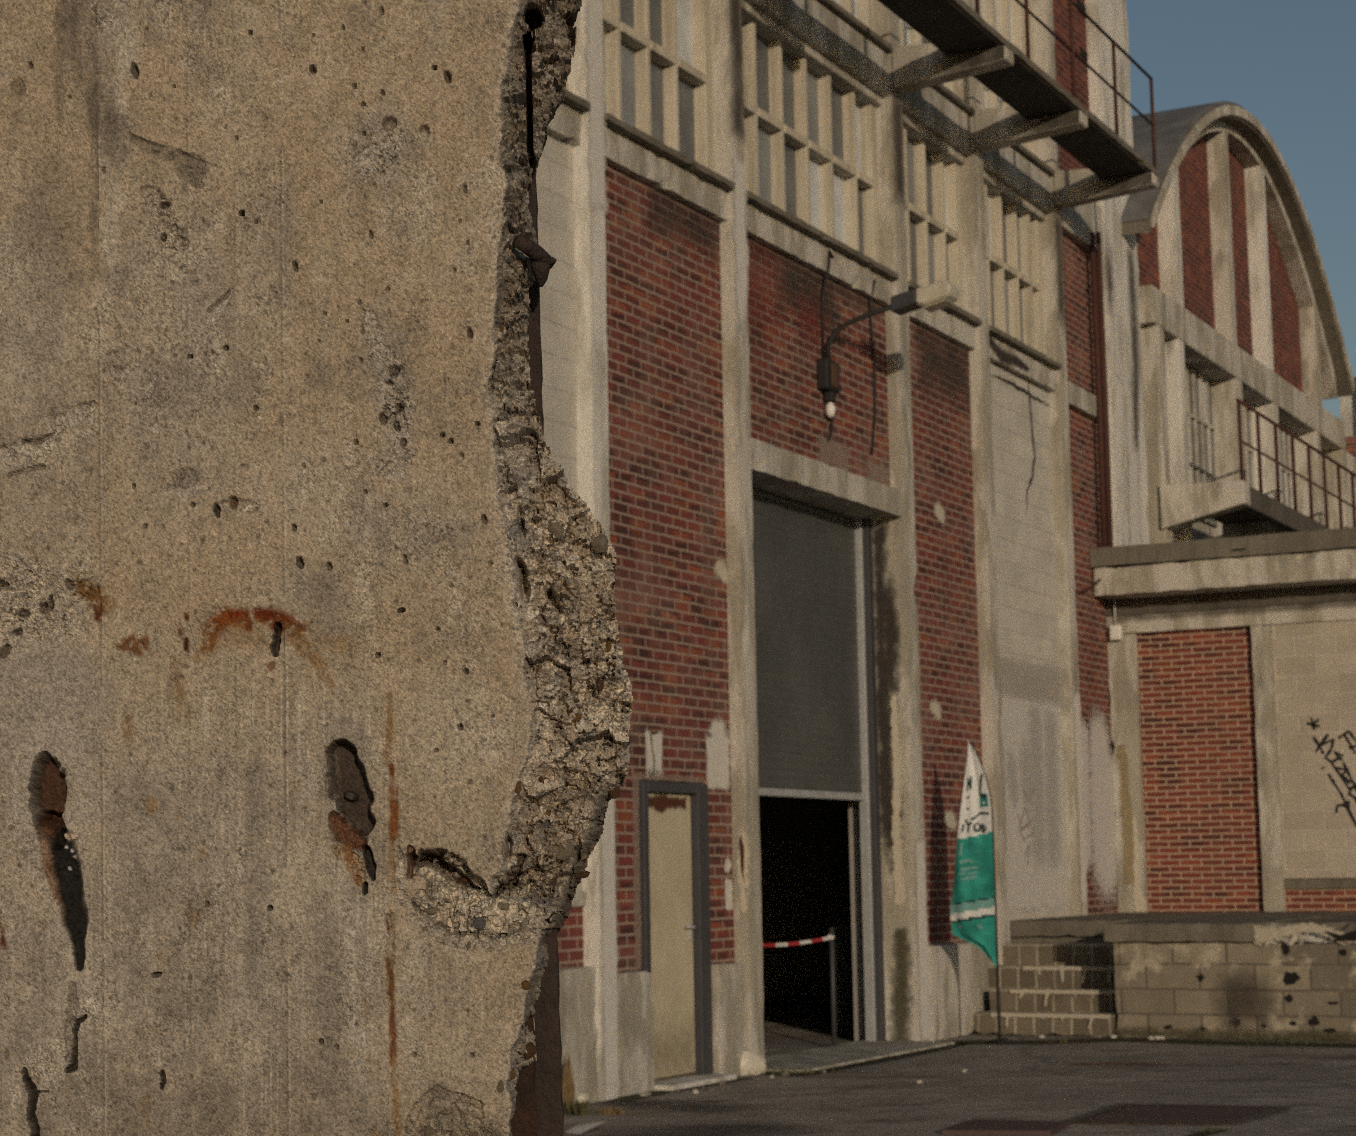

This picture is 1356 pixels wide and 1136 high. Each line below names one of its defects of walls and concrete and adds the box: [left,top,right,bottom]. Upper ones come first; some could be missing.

spalling [349,115,434,178]
crack [993,375,1051,514]
spalling [379,0,633,1136]
rust [167,601,360,725]
damp [872,524,902,852]
rust [328,811,368,894]
peeling [331,843,367,883]
rust [382,691,402,879]
crack [21,981,104,1136]
rust [383,908,403,1136]
spalling [1253,922,1356,1003]
spalling [1290,1015,1337,1033]